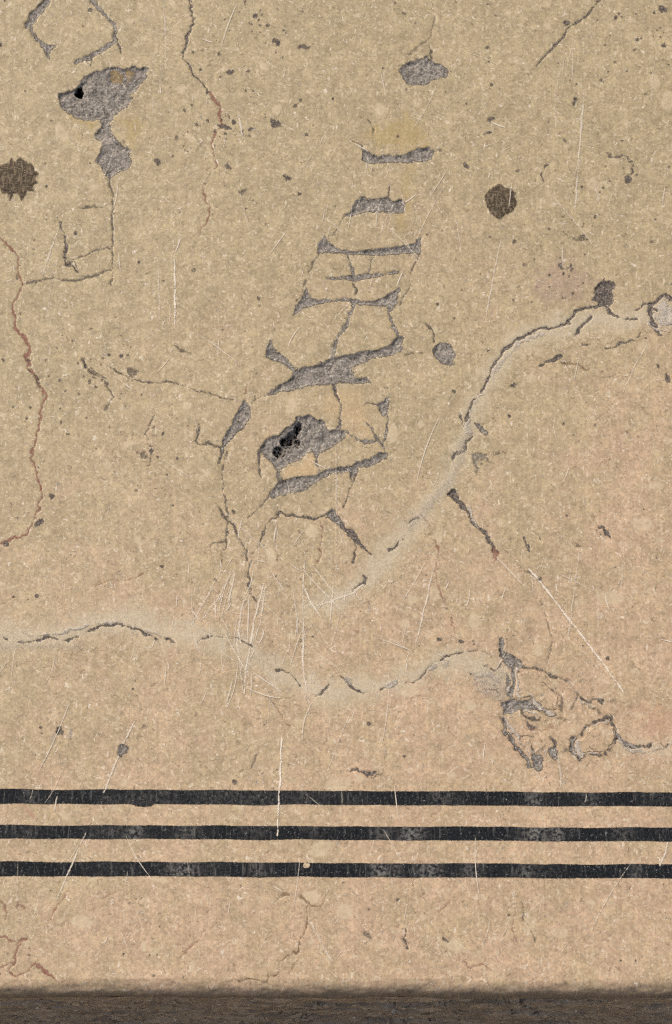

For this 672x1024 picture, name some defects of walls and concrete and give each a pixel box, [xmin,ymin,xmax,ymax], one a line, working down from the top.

crack [25,0,121,66]
spalling [398,49,451,85]
spalling [58,65,149,178]
damp [0,157,38,201]
spalling [346,185,405,216]
damp [484,184,517,218]
spalling [317,236,421,281]
crack [0,176,114,546]
spalling [257,287,456,498]
crack [451,279,641,460]
crack [447,489,500,560]
crack [3,621,174,643]